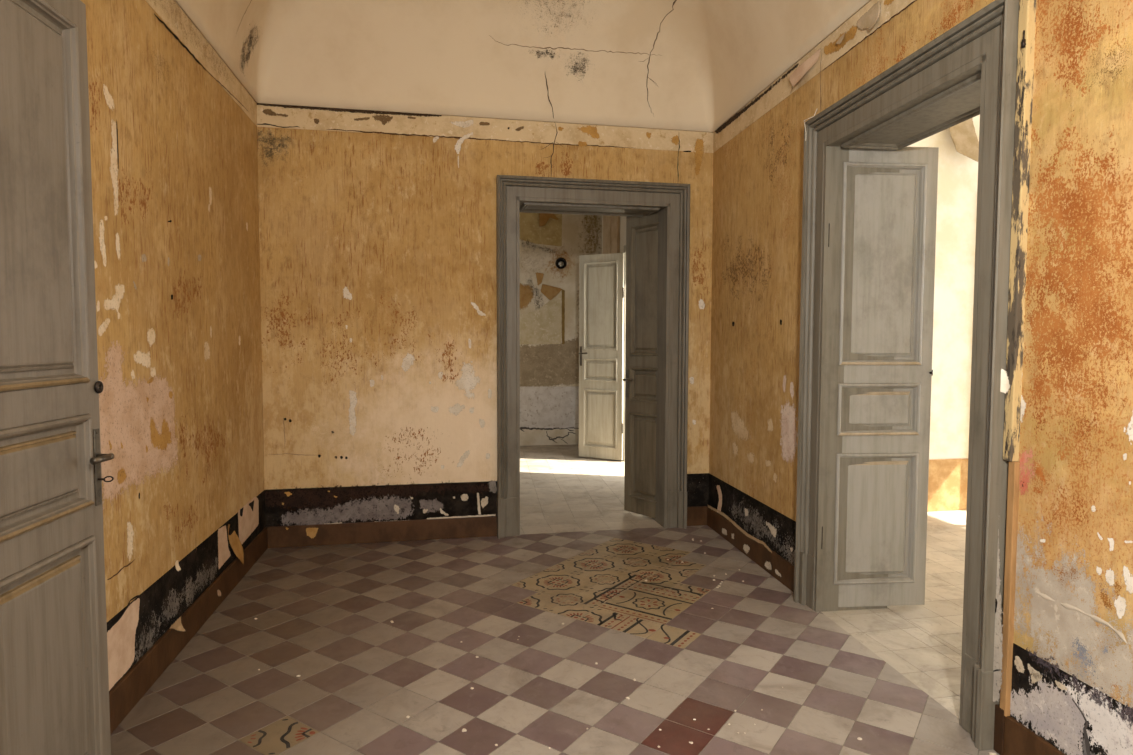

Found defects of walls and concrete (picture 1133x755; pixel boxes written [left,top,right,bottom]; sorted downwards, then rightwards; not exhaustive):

water stain [151,0,259,83]
water stain [508,0,593,81]
peeling [824,25,858,54]
peeling [94,84,121,269]
peeling [578,125,600,147]
flaking render [96,280,180,509]
peeling [1123,411,1133,460]
peeling [265,451,497,530]
flaking render [993,502,1133,755]